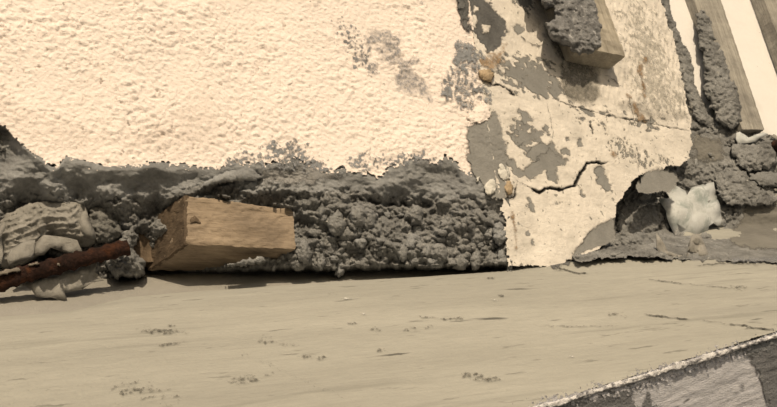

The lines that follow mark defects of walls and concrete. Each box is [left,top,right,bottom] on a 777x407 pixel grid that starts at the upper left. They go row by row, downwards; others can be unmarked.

peeling [337,16,430,100]
peeling [441,0,611,200]
spalling [551,1,777,269]
crack [506,161,607,199]
spalling [529,329,777,407]